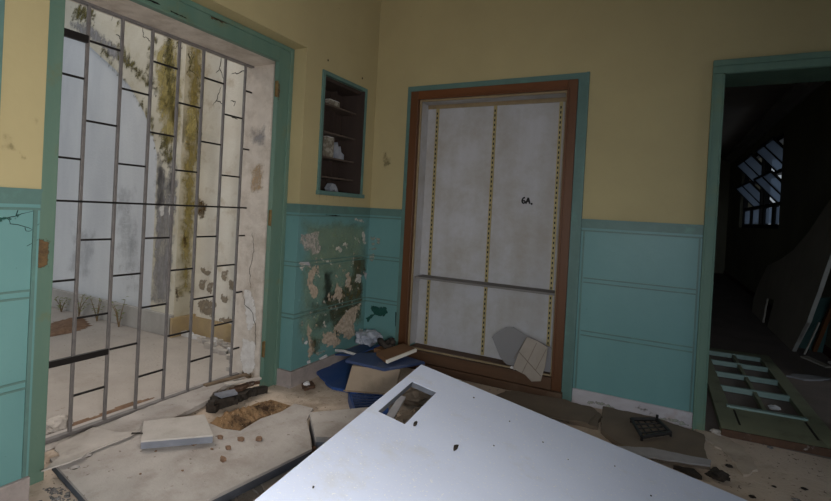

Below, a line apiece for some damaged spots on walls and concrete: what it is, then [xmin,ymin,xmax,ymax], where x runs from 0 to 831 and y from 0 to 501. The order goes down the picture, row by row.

damp [72,5,201,303]
crack [0,210,39,246]
peeling [299,231,388,364]